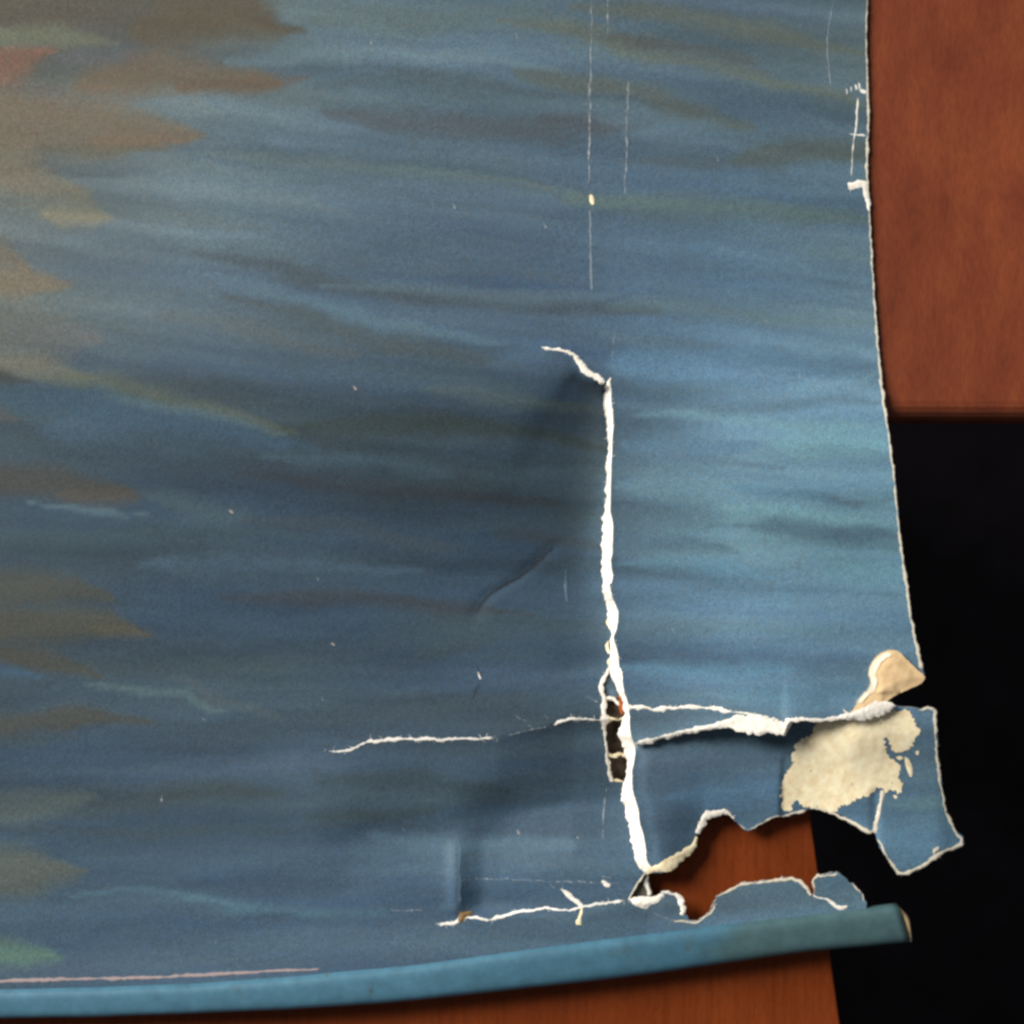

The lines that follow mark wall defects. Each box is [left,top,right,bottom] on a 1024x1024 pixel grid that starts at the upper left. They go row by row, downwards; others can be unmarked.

peeling [780,650,925,833]
peeling [630,893,664,909]